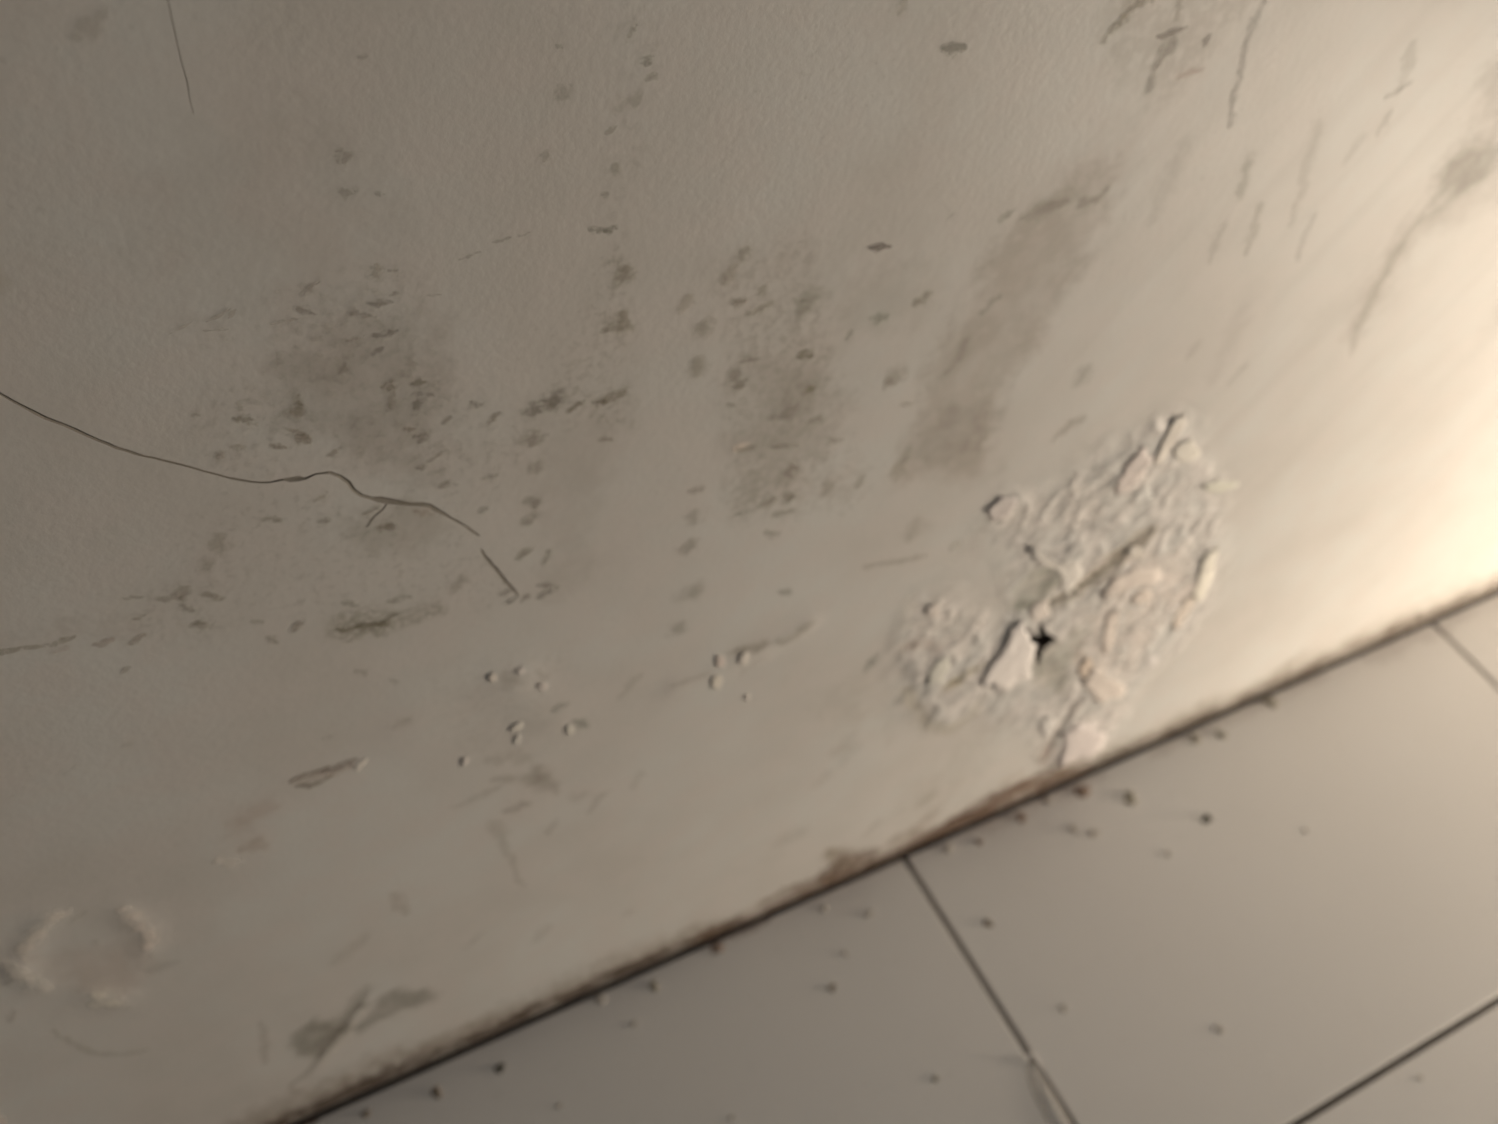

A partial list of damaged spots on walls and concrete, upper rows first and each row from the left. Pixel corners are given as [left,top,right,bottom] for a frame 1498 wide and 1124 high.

crack [0,392,519,596]
peeling [876,397,1244,779]